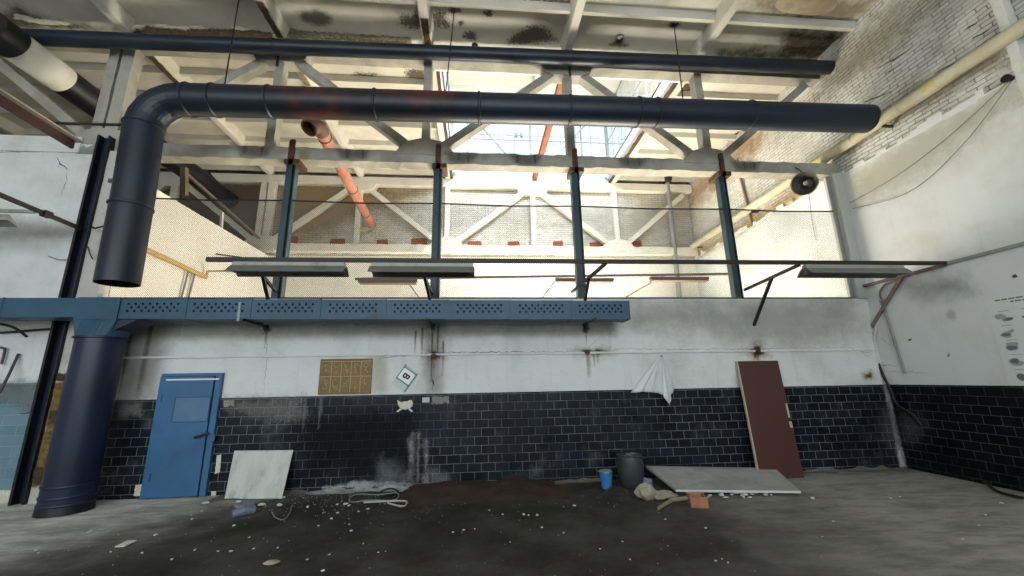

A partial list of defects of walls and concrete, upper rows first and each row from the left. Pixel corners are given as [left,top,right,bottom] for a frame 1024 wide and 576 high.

leakage [507,25,558,47]
leakage [718,0,865,60]
leakage [884,385,906,467]
leakage [306,433,429,495]